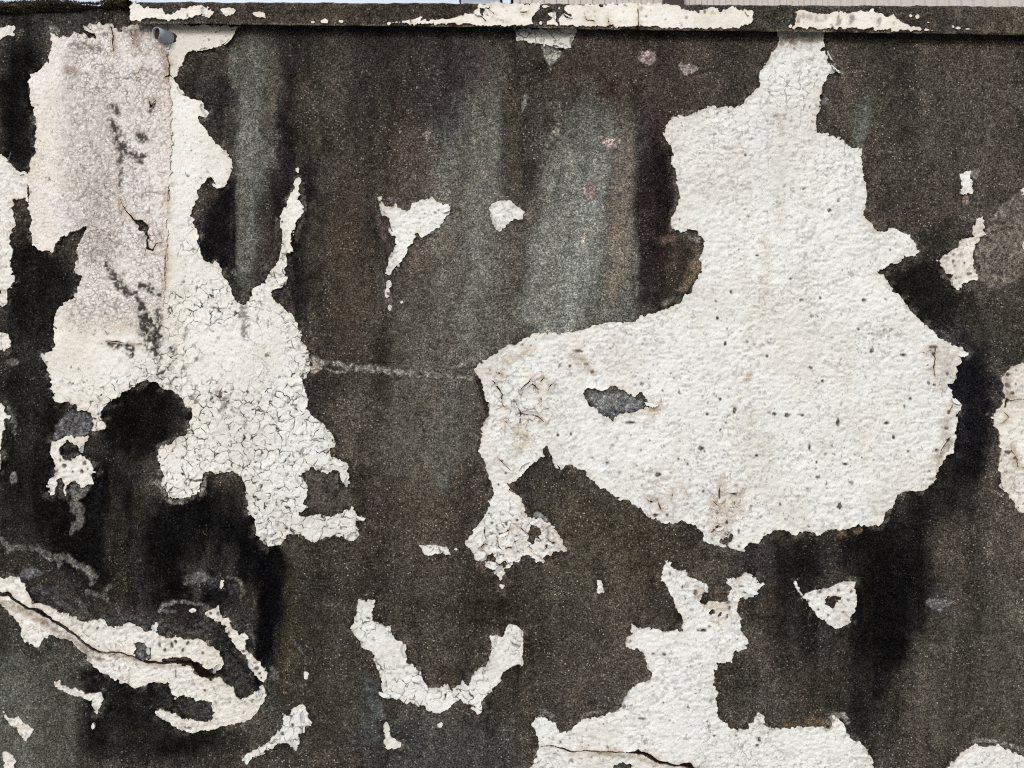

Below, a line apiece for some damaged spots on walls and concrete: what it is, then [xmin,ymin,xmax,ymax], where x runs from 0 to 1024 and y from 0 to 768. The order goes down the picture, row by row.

peeling [40,0,365,547]
peeling [376,196,451,321]
damp [517,121,672,335]
peeling [419,8,969,597]
crack [315,358,552,423]
peeling [990,362,1024,513]
damp [104,466,144,606]
crack [0,591,215,677]
peeling [0,536,279,733]
peeling [350,599,524,728]
crack [560,747,695,768]
damp [982,637,1015,752]